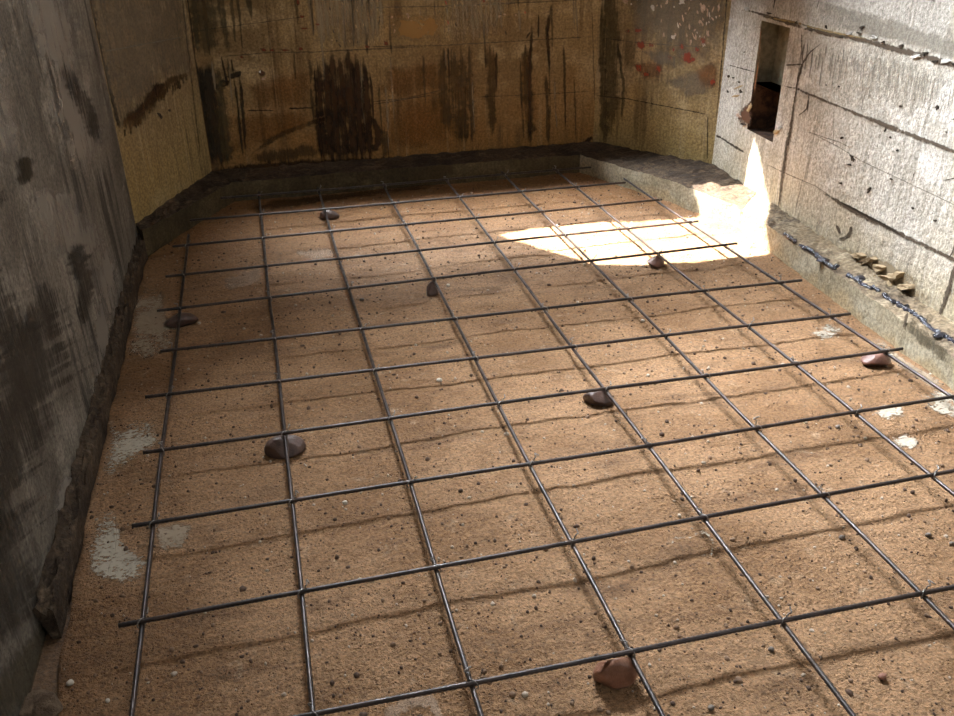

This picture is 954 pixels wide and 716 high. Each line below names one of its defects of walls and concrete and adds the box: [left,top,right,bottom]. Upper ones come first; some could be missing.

water stain [62,64,101,141]
water stain [92,0,394,170]
water stain [439,17,498,151]
water stain [518,0,625,145]
peeling [623,0,724,96]
water stain [17,157,33,183]
water stain [67,244,94,323]
water stain [297,248,334,259]
water stain [131,292,176,357]
water stain [0,270,82,643]
water stain [106,421,157,475]
water stain [89,512,147,583]